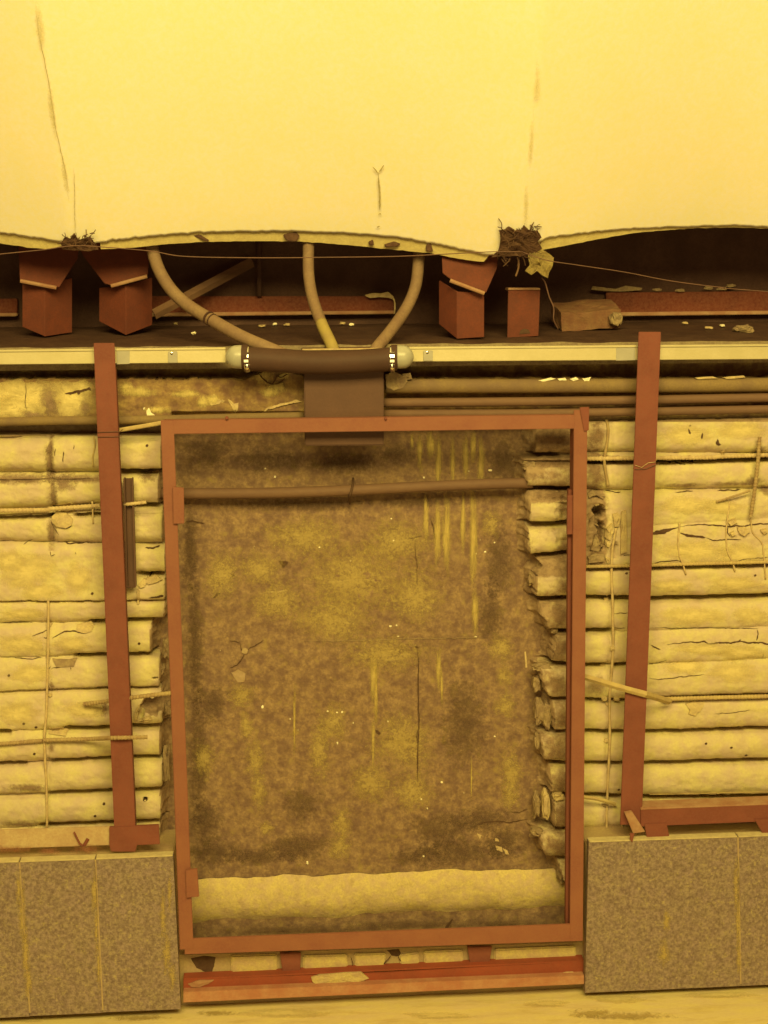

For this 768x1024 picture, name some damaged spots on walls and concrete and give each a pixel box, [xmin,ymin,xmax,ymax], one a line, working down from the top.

crack [373,165,384,228]
spalling [57,230,98,251]
spalling [492,218,554,278]
flaking render [365,292,396,314]
leakage [387,435,484,481]
spalling [656,437,768,517]
spalling [0,502,100,528]
crack [653,523,768,561]
leakage [203,494,514,810]
crack [651,627,768,680]
spalling [0,727,148,746]
crack [413,646,421,779]